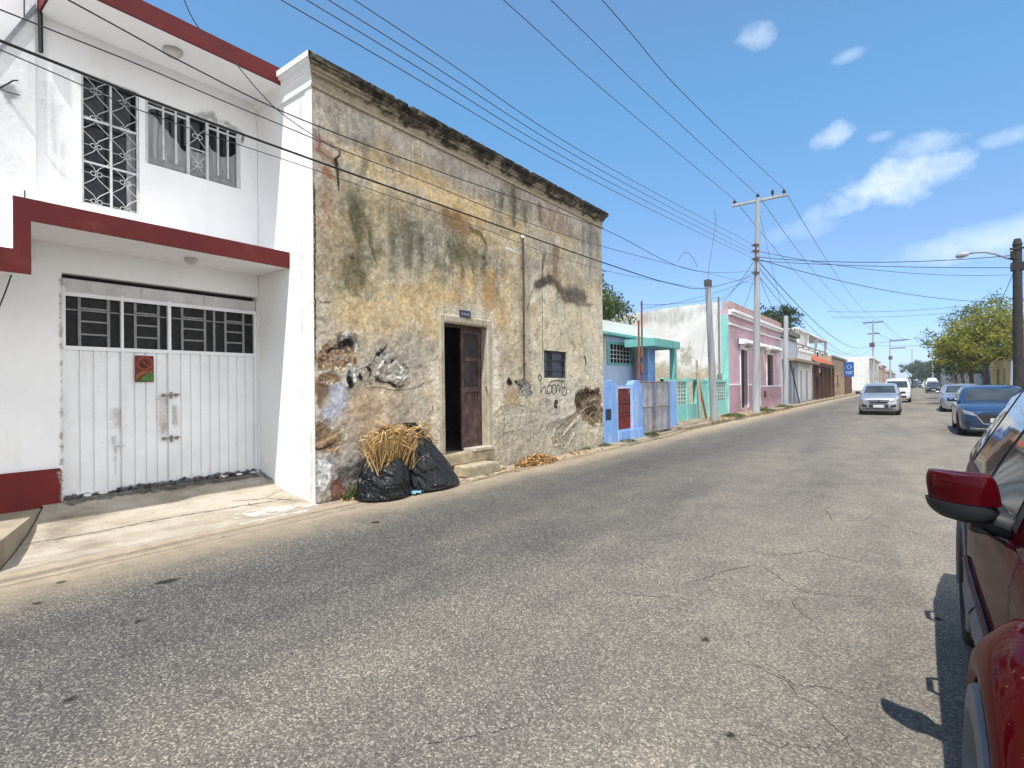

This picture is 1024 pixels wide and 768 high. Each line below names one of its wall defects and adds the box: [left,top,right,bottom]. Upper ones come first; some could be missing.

damp [350,195,374,250]
damp [535,247,593,306]
peeling [315,332,409,389]
spalling [552,385,603,448]
crack [724,654,874,768]